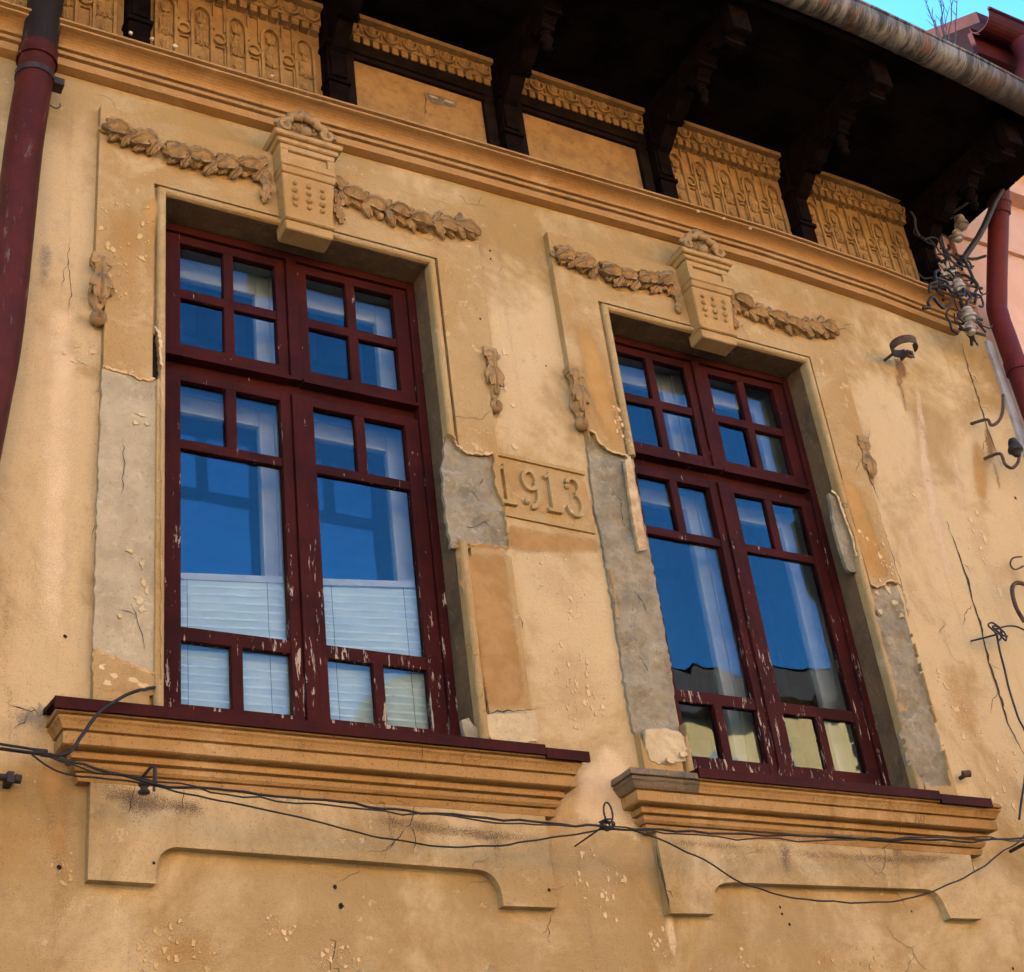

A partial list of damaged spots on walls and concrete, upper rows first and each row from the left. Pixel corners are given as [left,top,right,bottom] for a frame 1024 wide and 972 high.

flaking render [90,326,163,697]
flaking render [440,436,510,550]
flaking render [585,376,691,765]
flaking render [826,490,948,787]
crack [963,349,1002,466]
crack [946,521,1024,753]
peeling [574,847,627,923]